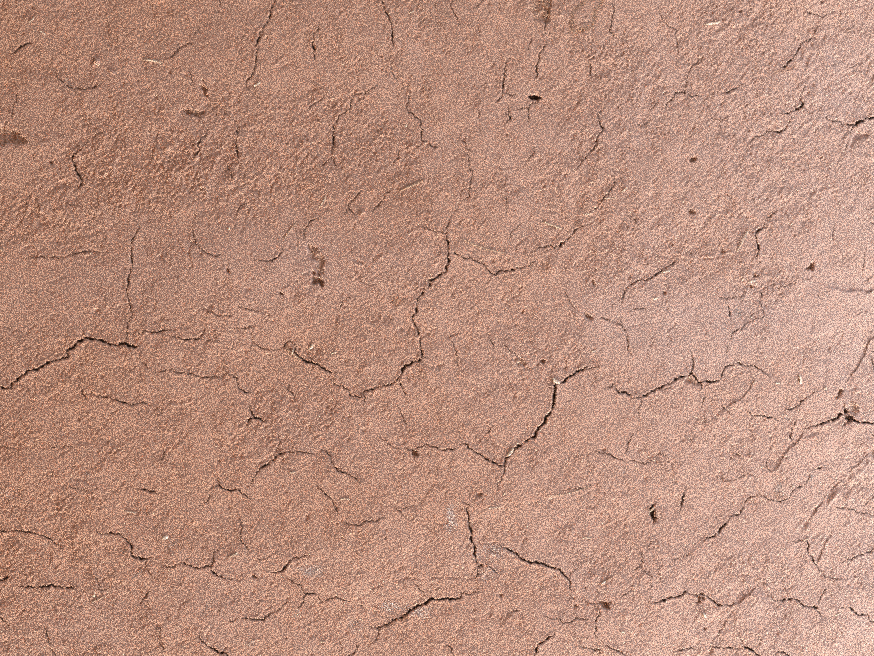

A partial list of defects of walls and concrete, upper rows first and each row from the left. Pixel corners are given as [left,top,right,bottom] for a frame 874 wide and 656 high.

crack [478,3,550,126]
crack [751,83,874,151]
crack [0,173,615,506]
crack [601,262,675,352]
crack [596,279,874,465]
crack [672,458,823,561]
crack [95,529,232,604]
crack [231,518,350,622]
crack [348,501,624,656]
crack [622,539,736,607]
crack [770,539,874,623]
crack [679,633,789,656]